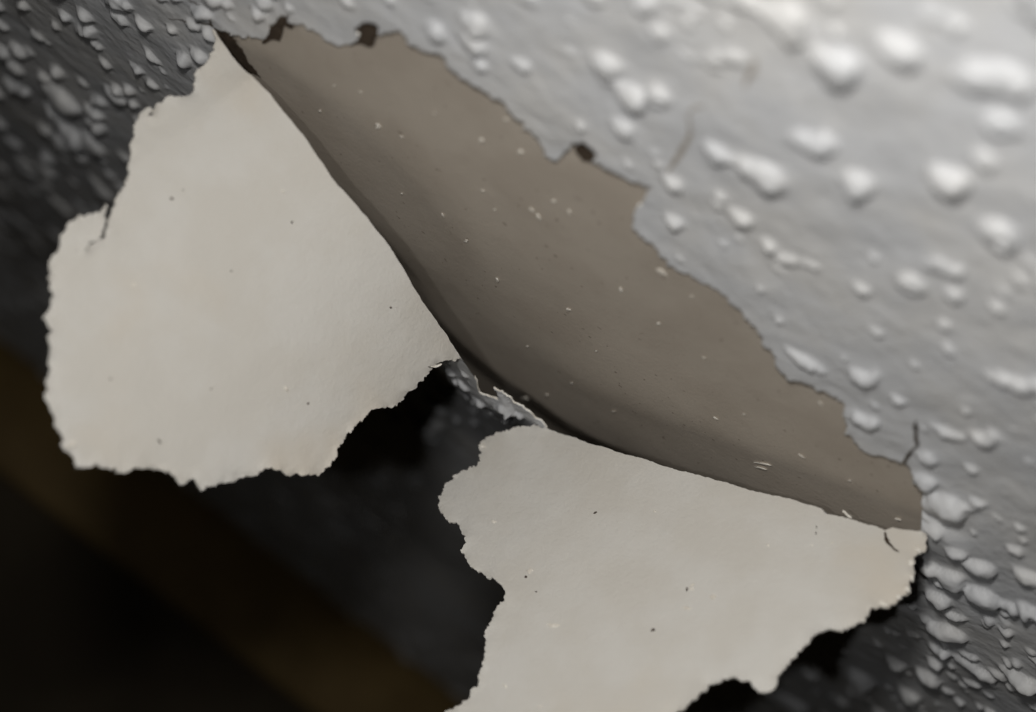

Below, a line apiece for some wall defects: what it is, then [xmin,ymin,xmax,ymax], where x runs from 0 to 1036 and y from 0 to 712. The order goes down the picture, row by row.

peeling [42,27,461,491]
peeling [262,15,295,44]
peeling [232,22,927,712]